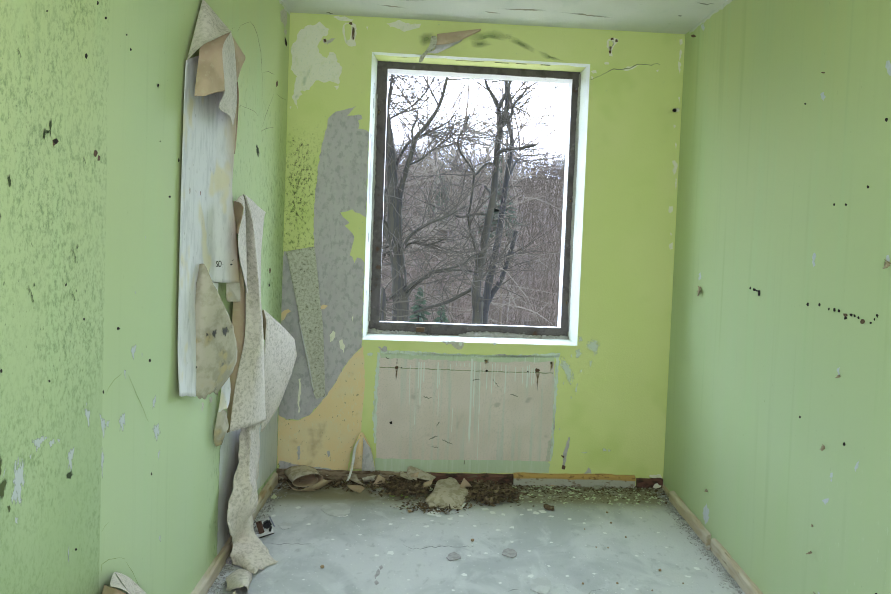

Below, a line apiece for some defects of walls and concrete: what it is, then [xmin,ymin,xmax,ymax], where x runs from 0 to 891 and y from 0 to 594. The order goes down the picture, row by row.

peeling [280,9,368,109]
peeling [387,20,421,32]
crack [591,63,660,80]
peeling [257,38,618,490]
peeling [3,436,60,504]
peeling [217,429,241,564]